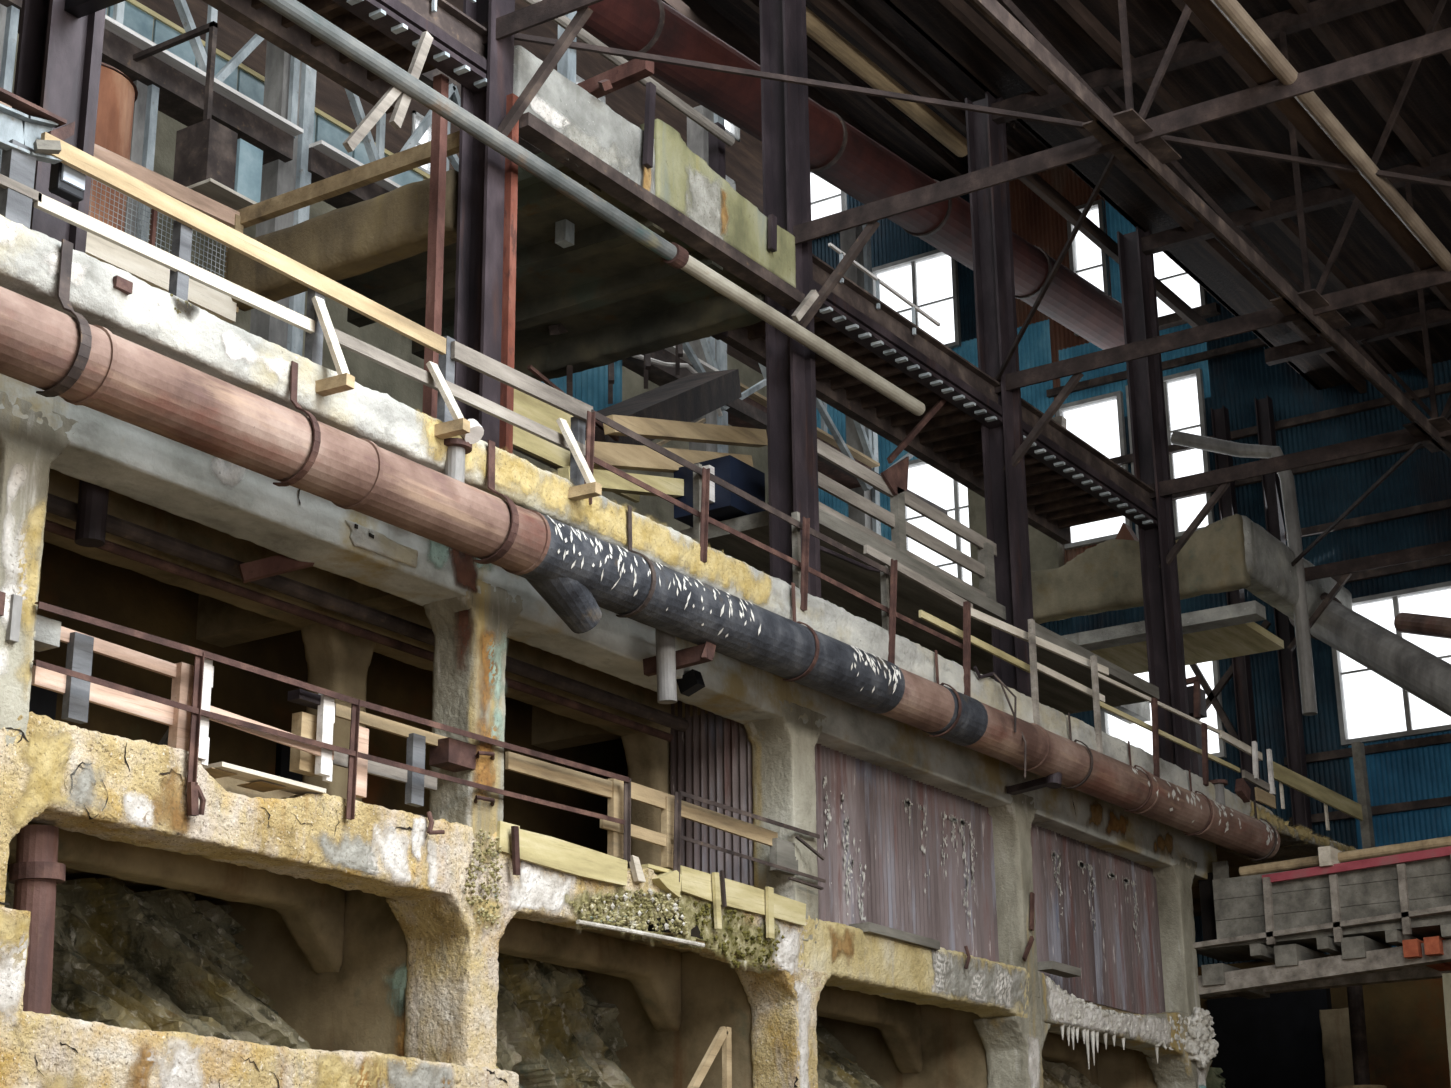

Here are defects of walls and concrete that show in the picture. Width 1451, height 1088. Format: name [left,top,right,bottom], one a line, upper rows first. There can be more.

corrosion [448,547,505,796]
damp [932,949,1026,1009]
damp [1046,977,1192,1050]